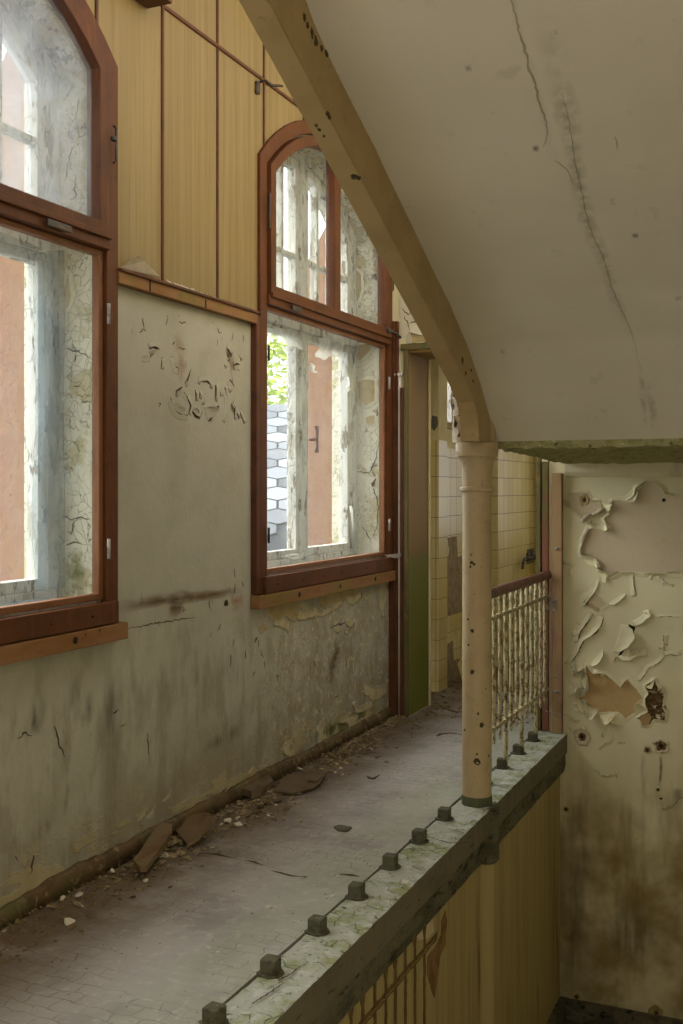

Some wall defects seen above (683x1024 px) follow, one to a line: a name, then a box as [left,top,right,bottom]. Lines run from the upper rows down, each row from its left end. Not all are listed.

crack [510,0,641,368]
peeling [142,341,246,424]
water stain [144,592,225,611]
crack [129,569,347,684]
spalling [316,681,386,744]
peeling [447,536,476,646]
peeling [568,609,670,754]
peeling [563,477,683,616]